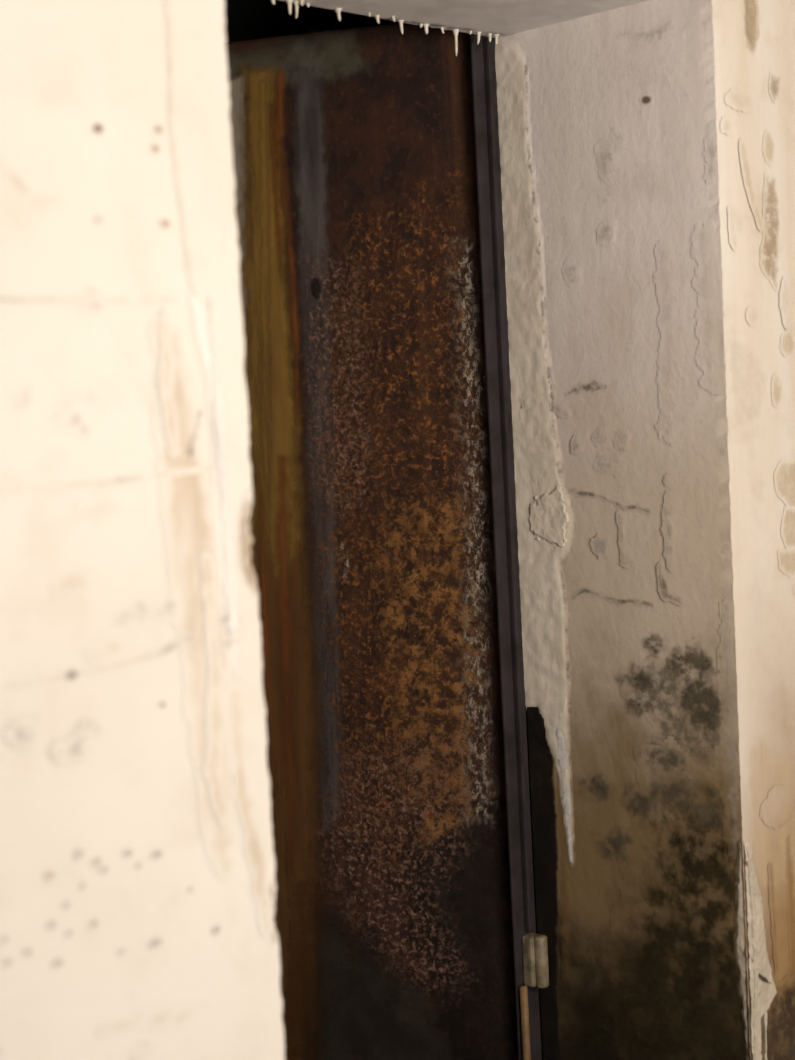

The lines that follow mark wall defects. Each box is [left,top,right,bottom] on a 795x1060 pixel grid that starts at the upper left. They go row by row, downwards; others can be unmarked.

leakage [768,72,782,103]
corrosion [242,68,299,760]
flaking render [495,38,577,1060]
leakage [774,459,795,594]
leakage [559,600,795,1060]